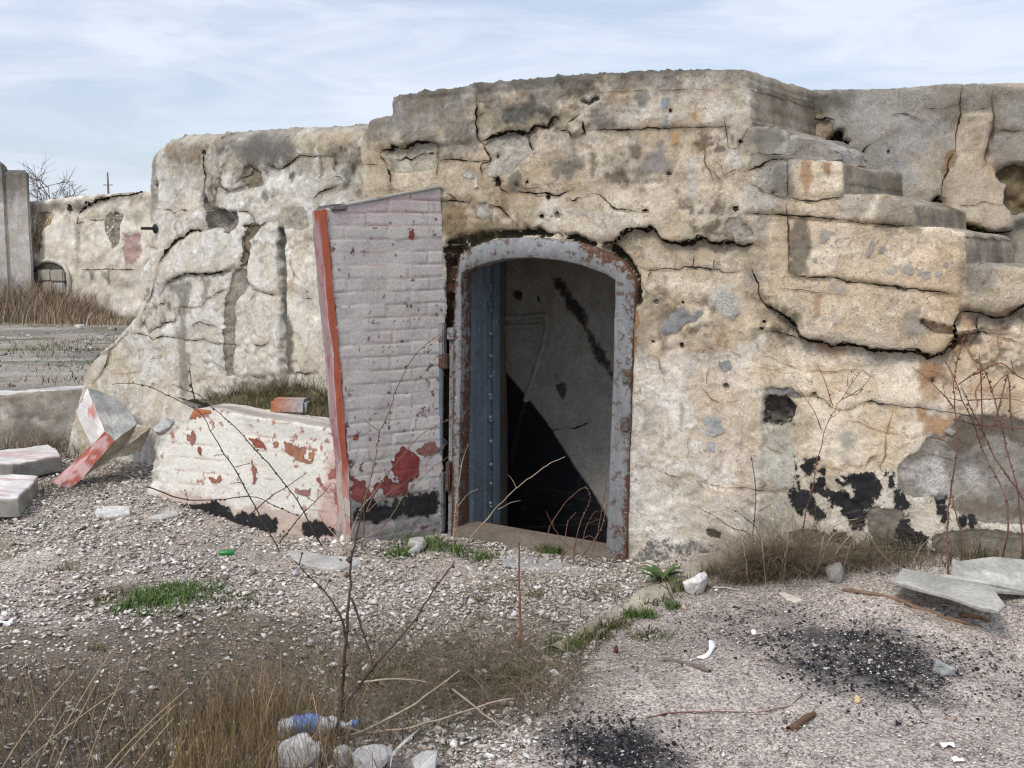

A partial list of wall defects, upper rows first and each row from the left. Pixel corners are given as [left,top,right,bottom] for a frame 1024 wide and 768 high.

spalling [105,211,123,248]
crack [77,133,342,381]
leakage [277,227,293,374]
crack [364,89,1024,474]
peeling [183,409,211,456]
peeling [249,438,314,485]
spalling [271,397,311,415]
peeling [295,467,337,505]
peeling [350,369,449,504]
crack [661,427,791,494]
peeling [784,414,1024,559]
peeling [301,519,336,539]